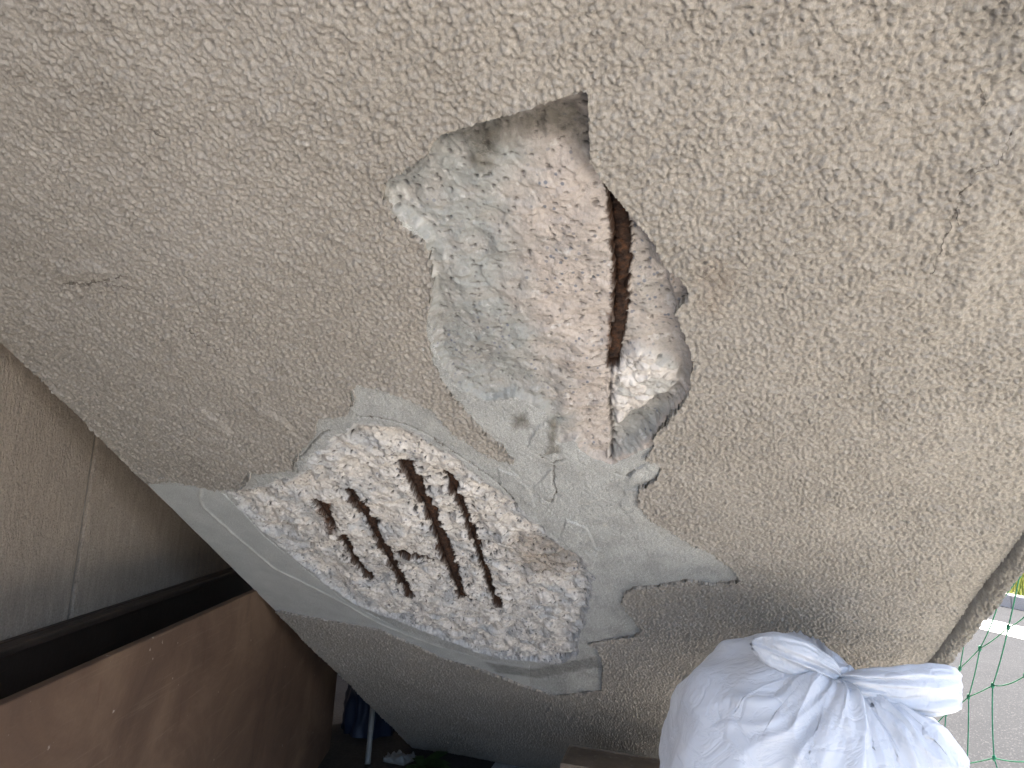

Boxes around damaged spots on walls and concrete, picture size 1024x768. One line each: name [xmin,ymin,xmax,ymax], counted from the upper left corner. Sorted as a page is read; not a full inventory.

spalling [148,85,737,695]